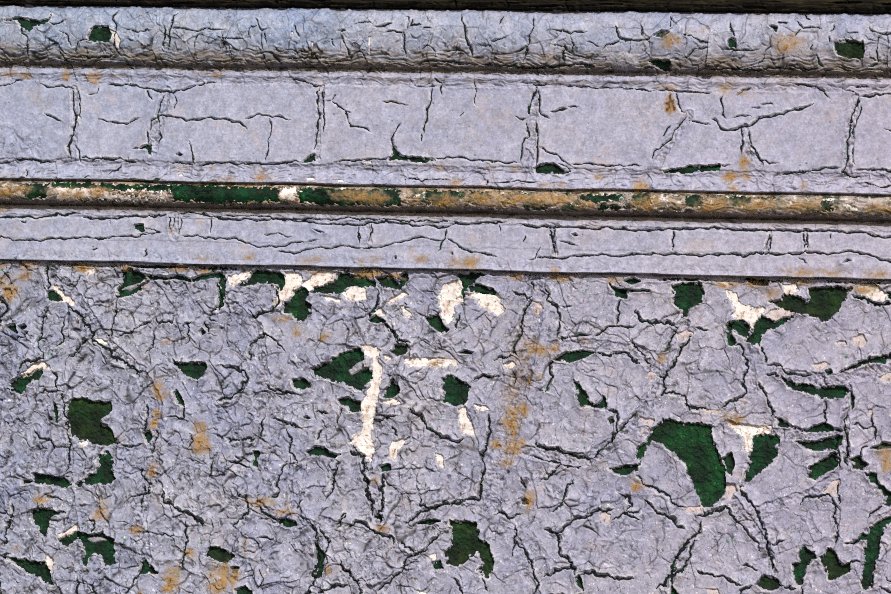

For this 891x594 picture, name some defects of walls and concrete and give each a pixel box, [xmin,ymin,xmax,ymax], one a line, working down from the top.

crack [0,10,891,188]
peeling [24,398,119,489]
crack [0,265,223,474]
peeling [118,265,411,323]
peeling [293,344,489,462]
crack [305,414,492,594]
crack [0,211,891,402]
peeling [418,519,494,578]
crack [497,410,804,594]
crack [595,299,811,416]
peeling [613,417,843,513]
peeling [663,278,891,347]